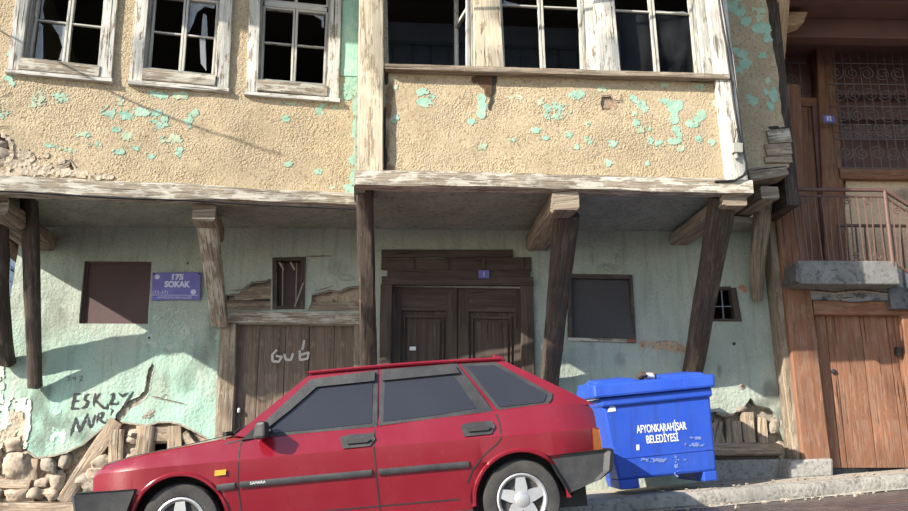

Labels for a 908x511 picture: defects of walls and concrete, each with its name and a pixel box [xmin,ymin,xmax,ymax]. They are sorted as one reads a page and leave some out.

peeling [727,0,773,73]
peeling [29,87,69,109]
peeling [75,90,199,159]
peeling [529,89,585,141]
spalling [597,85,615,110]
peeling [629,81,717,152]
peeling [745,77,778,113]
spalling [0,132,114,180]
spalling [226,281,271,311]
spalling [308,287,359,312]
spalling [0,364,210,511]
spalling [711,401,786,460]